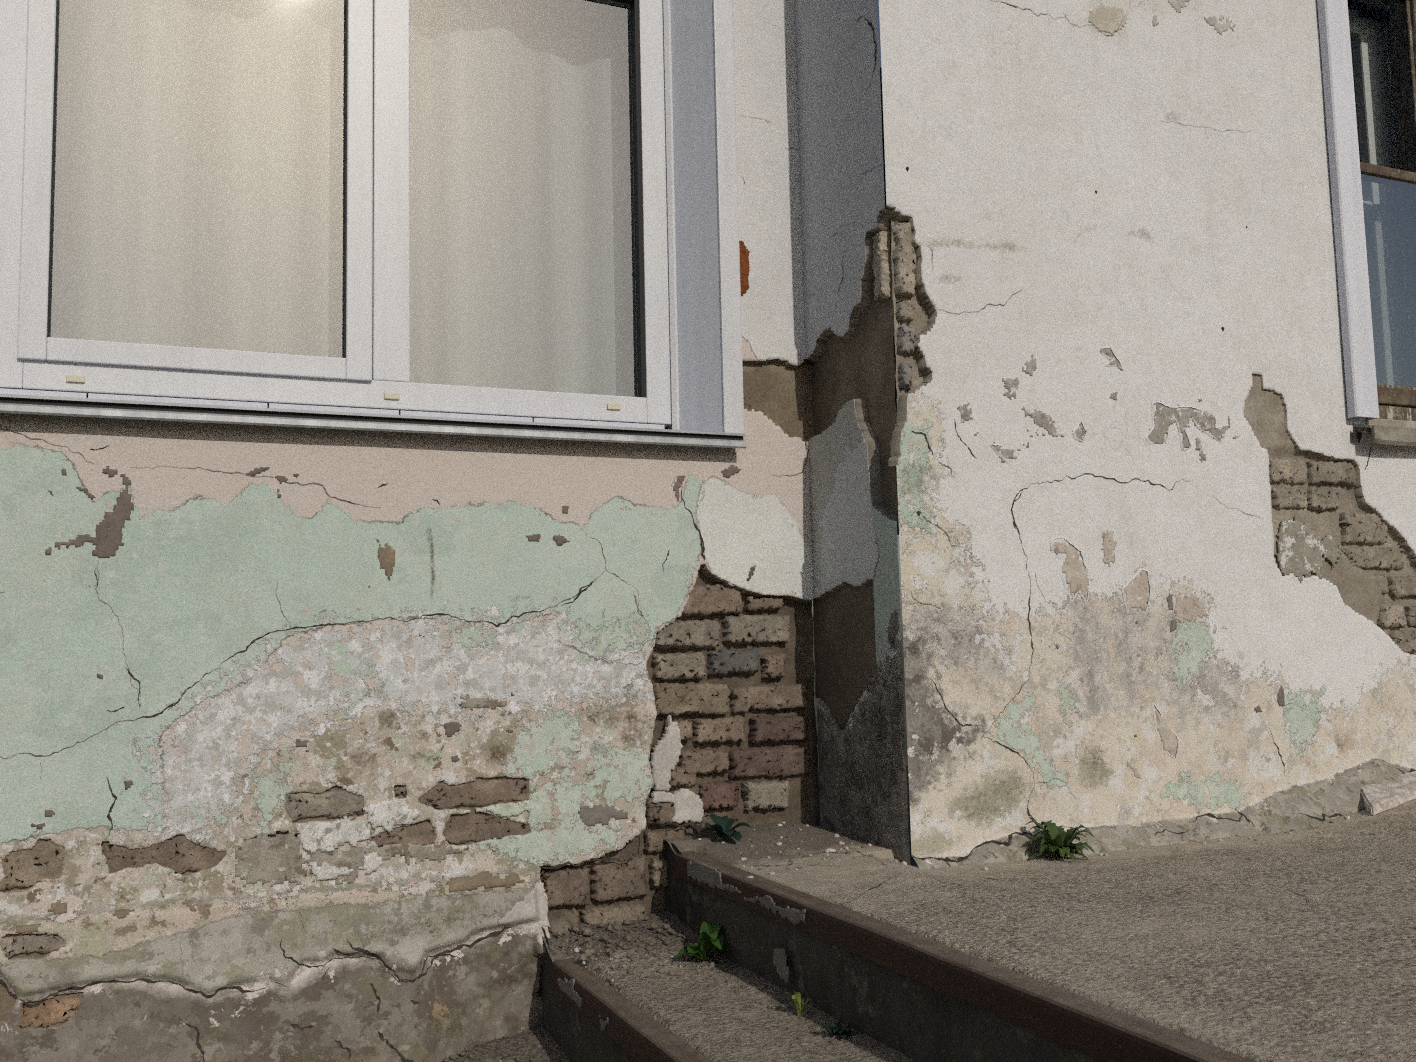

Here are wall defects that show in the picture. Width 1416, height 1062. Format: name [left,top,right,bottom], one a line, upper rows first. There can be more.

peeling [45,466,134,558]
crack [1,429,386,508]
crack [663,476,705,569]
flaking render [743,217,929,525]
crack [913,422,976,473]
peeling [957,355,1087,464]
flaking render [1145,375,1416,655]
crack [0,537,650,778]
flaking render [101,565,899,935]
crack [749,473,1260,906]
flaking render [0,810,65,892]
crack [0,911,522,1062]